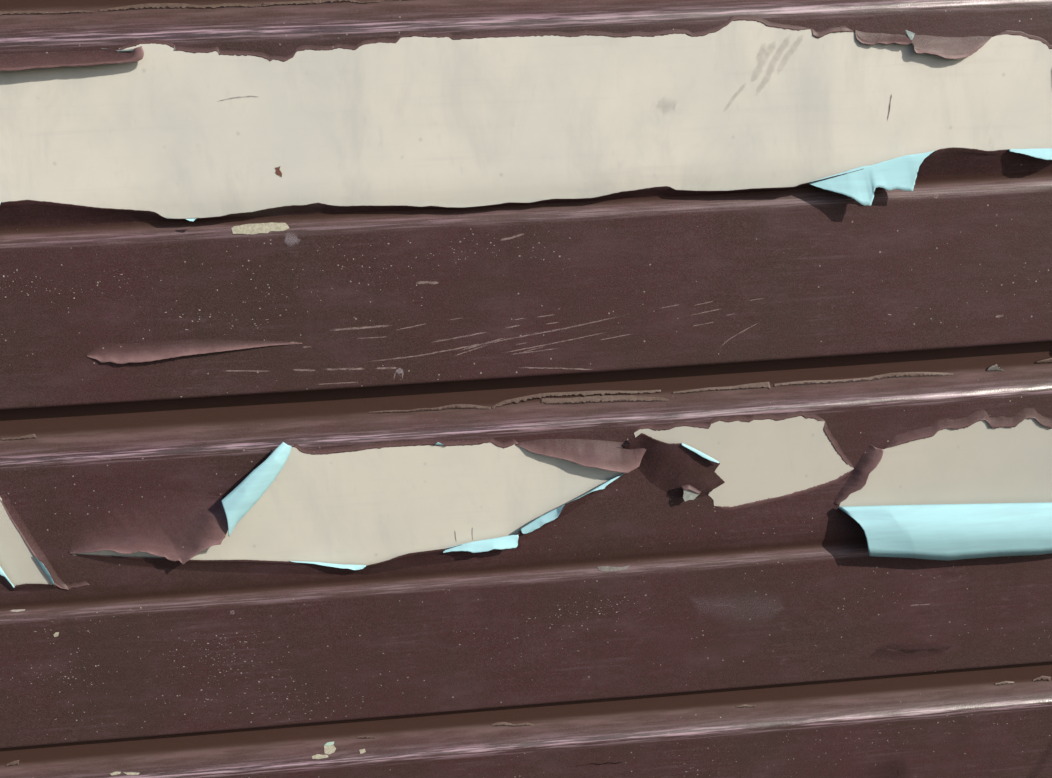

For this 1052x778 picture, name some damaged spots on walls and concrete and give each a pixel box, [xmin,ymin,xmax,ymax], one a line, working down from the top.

peeling [0,15,1052,243]
peeling [0,494,89,591]
peeling [68,408,1052,575]